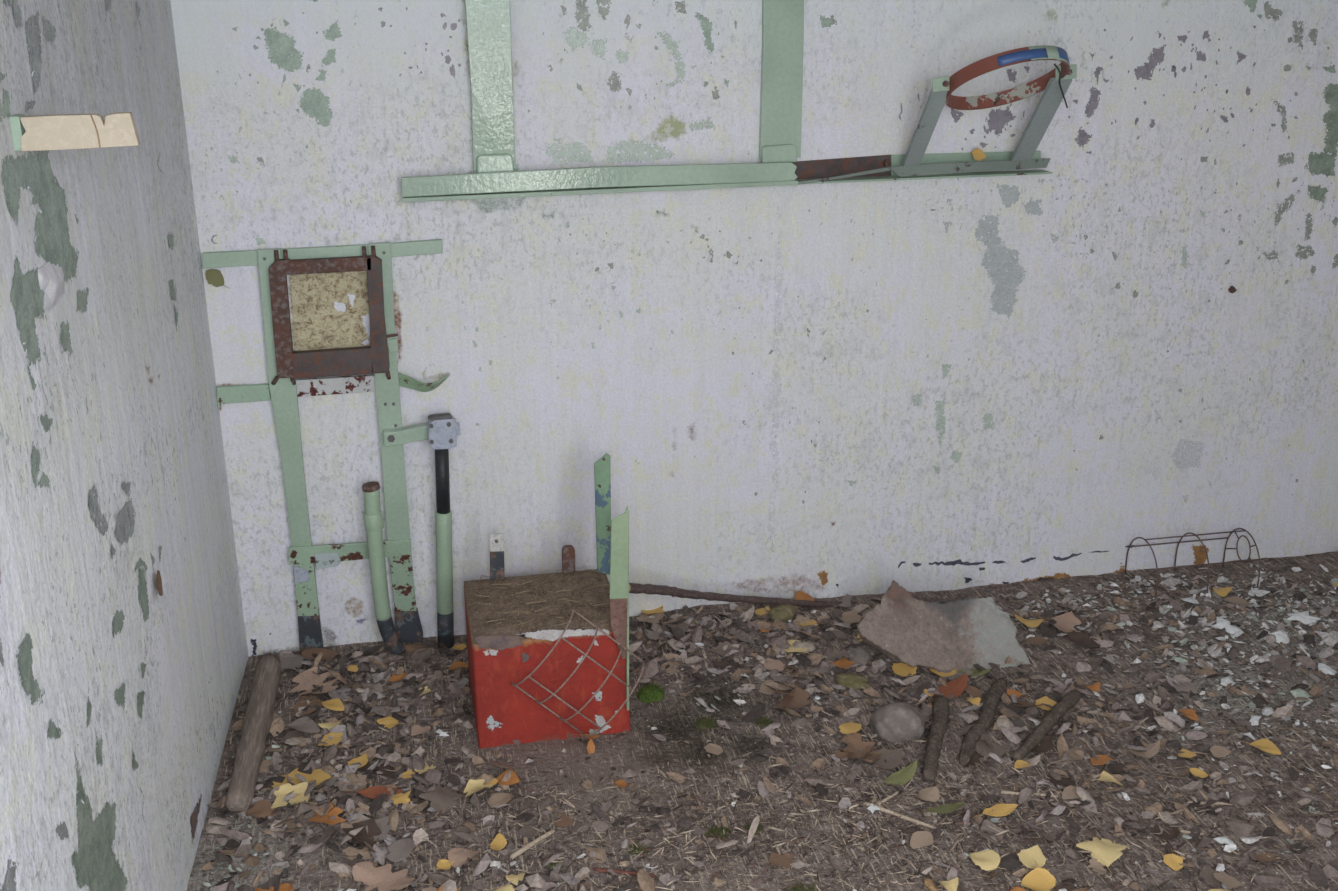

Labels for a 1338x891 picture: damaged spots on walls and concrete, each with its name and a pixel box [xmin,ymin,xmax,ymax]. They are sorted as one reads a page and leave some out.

peeling [253,19,356,127]
peeling [548,0,725,109]
peeling [951,103,1025,151]
peeling [1068,53,1113,154]
peeling [1128,30,1256,165]
peeling [1221,65,1338,284]
peeling [1242,0,1329,49]
peeling [1,150,89,390]
peeling [88,482,135,559]
peeling [135,545,162,622]
peeling [0,634,45,705]
peeling [55,755,128,891]